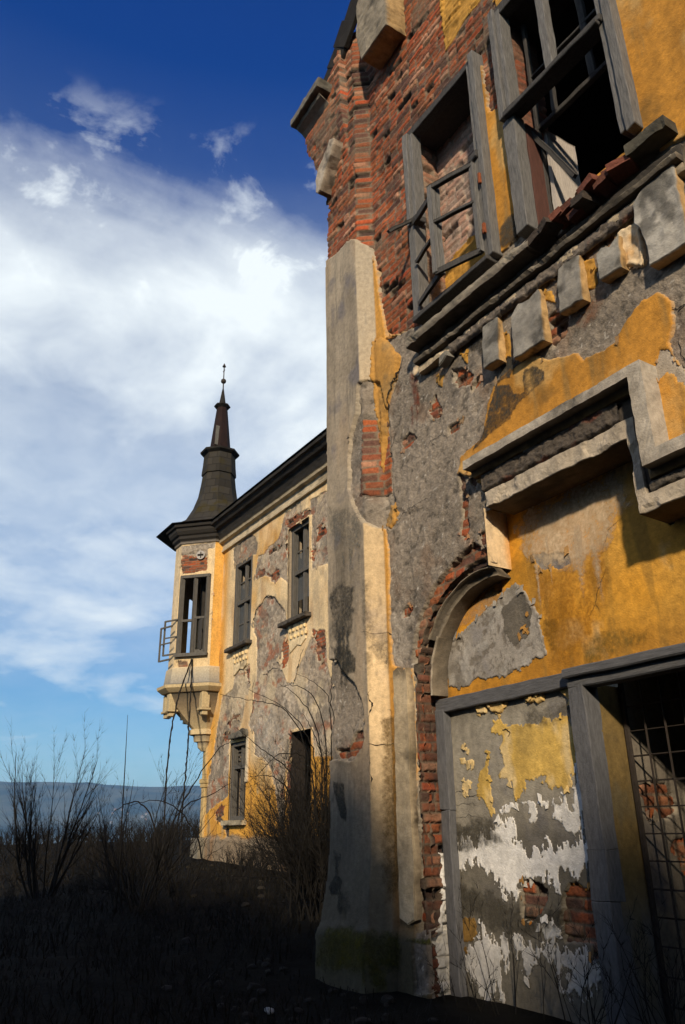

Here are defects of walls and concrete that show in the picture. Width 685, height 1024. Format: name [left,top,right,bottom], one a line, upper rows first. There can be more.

flaking render [179,542,216,575]
flaking render [305,0,685,1024]
water stain [330,585,366,682]
flaking render [206,596,365,837]
water stain [333,783,346,821]